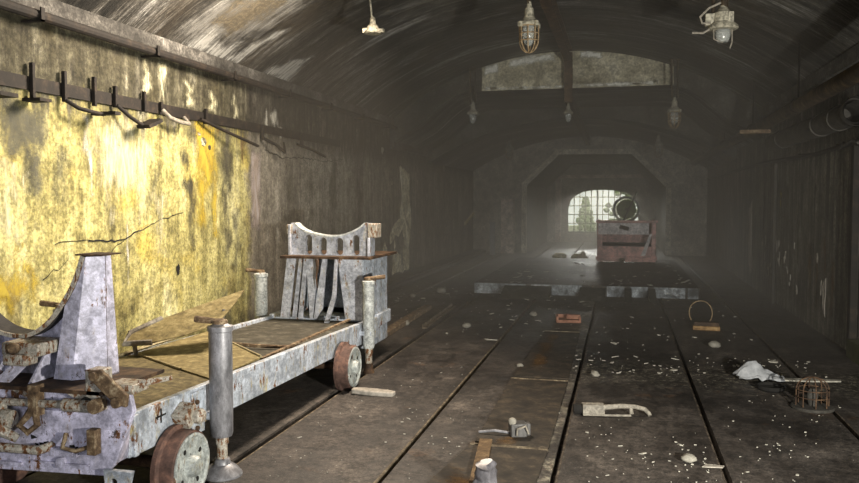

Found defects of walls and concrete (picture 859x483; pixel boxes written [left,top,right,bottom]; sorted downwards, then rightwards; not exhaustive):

leakage [0,86,48,241]
leakage [103,126,151,190]
leakage [185,179,195,225]
leakage [218,145,241,267]
leakage [251,152,261,228]
crack [43,212,183,280]